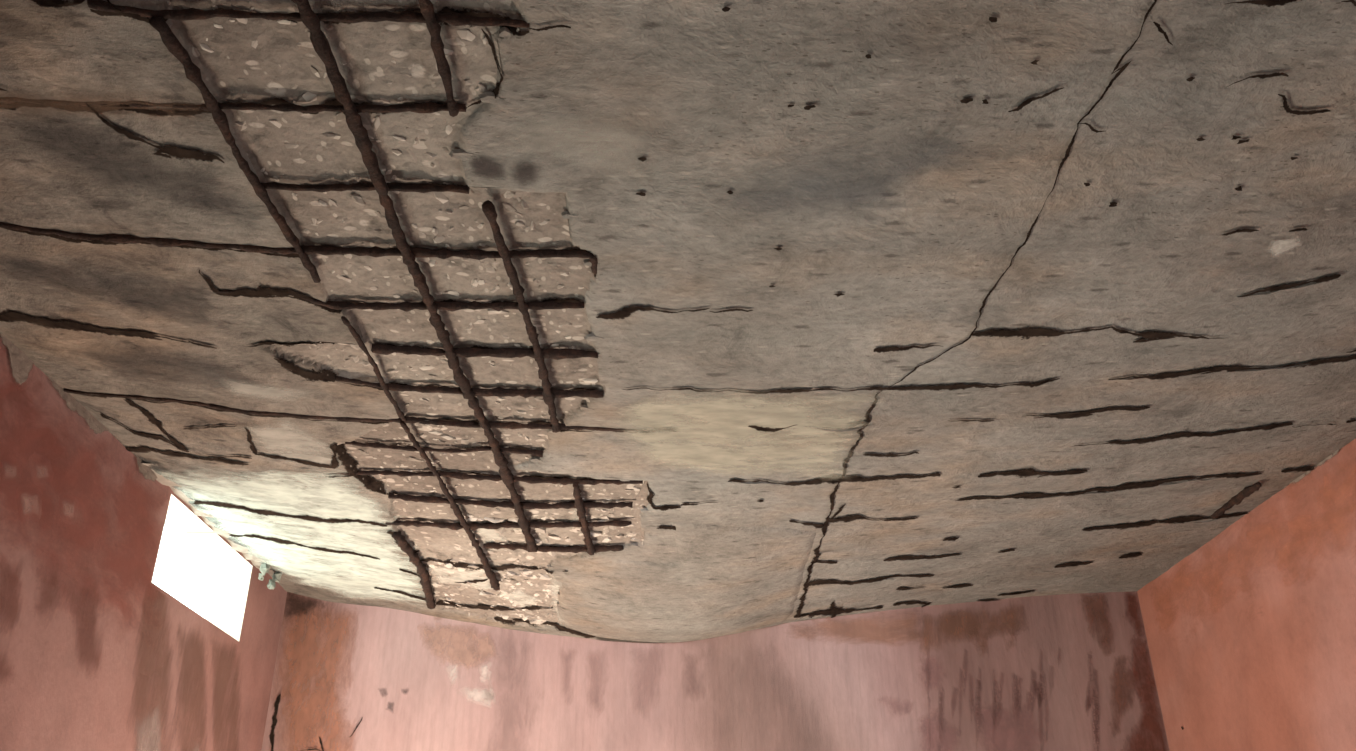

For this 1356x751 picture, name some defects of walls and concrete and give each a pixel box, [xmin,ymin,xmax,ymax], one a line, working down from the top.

spalling [0,0,654,628]
crack [596,306,753,320]
crack [623,0,1356,620]
water stain [0,384,250,751]
water stain [824,610,1019,651]
water stain [1083,596,1110,649]
water stain [1113,594,1166,751]
spalling [1210,482,1262,519]